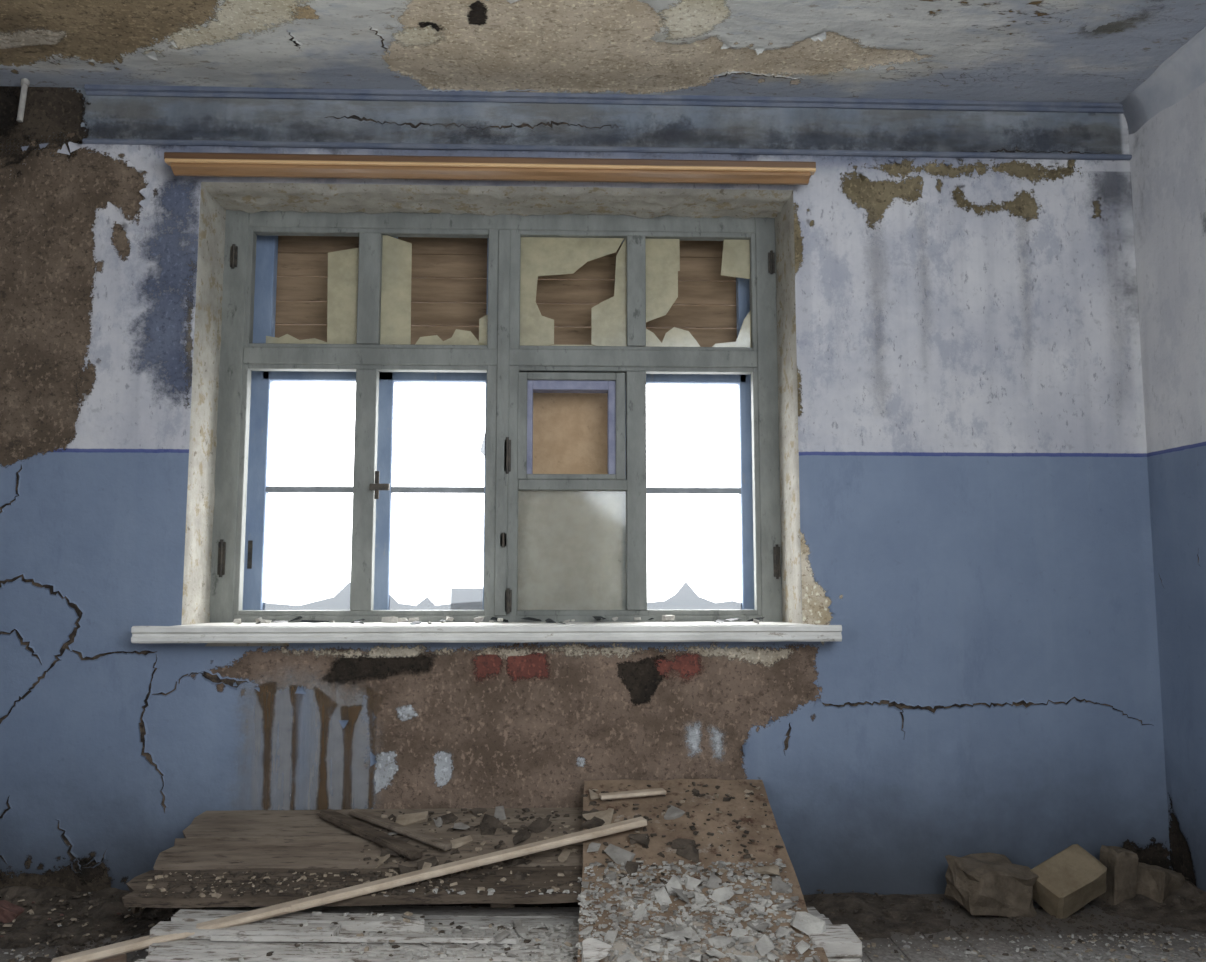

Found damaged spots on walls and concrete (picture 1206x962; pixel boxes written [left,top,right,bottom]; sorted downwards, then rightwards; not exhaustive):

spalling [381,0,934,95]
peeling [840,146,1082,230]
spalling [0,0,319,468]
peeling [794,203,814,274]
crack [0,464,23,515]
spalling [800,532,843,625]
crack [0,573,249,814]
spalling [191,641,824,809]
crack [782,722,793,756]
crack [821,696,1154,740]
crack [0,795,13,820]
crack [55,819,107,874]